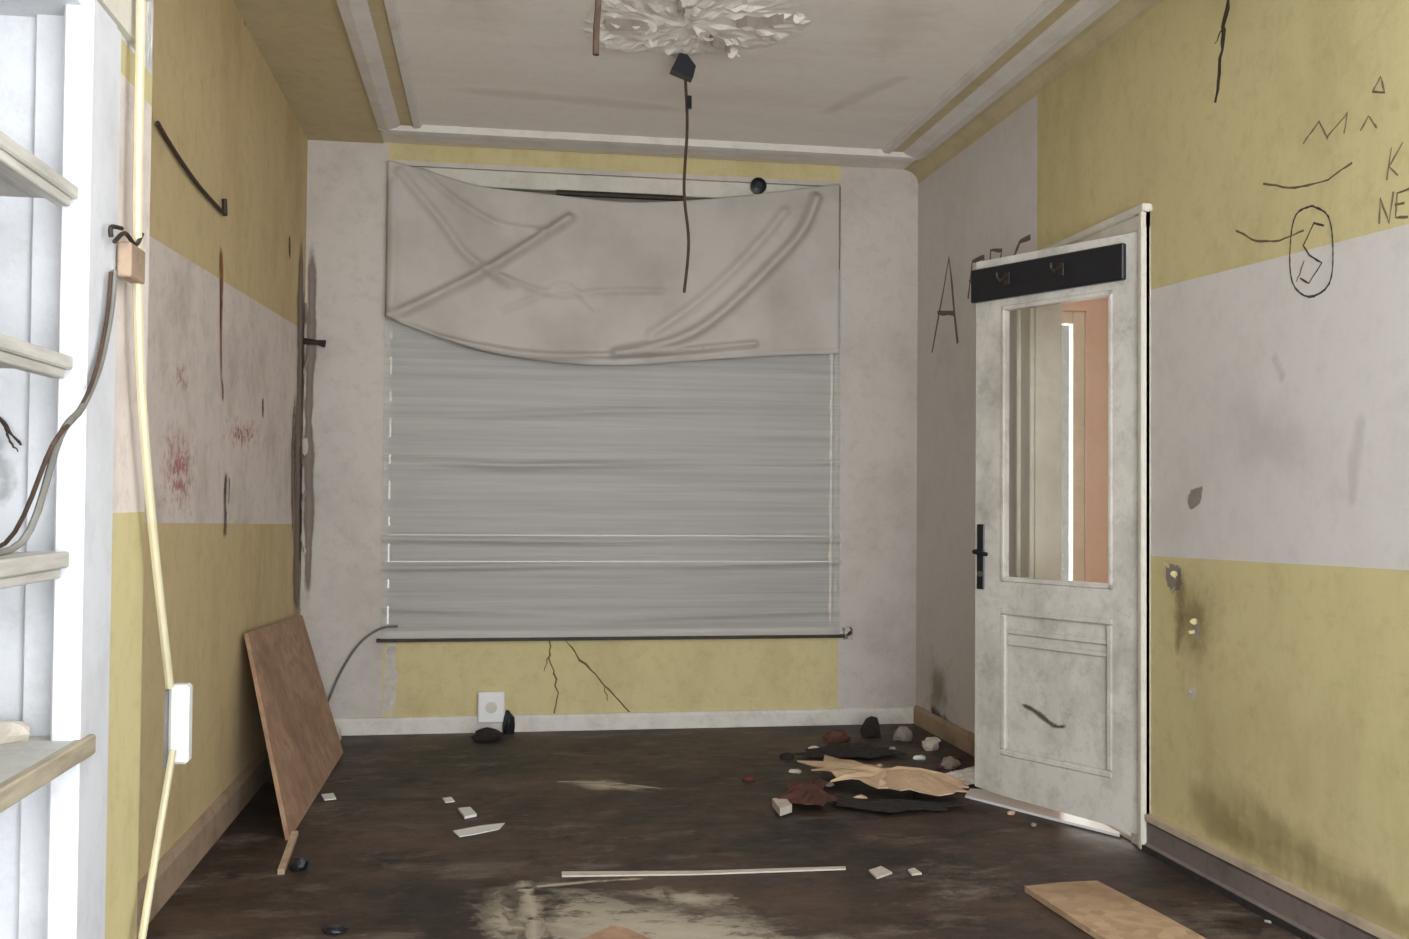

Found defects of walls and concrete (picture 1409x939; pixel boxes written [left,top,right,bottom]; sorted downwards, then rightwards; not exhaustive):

flaking render [581,0,815,58]
crack [1214,0,1230,103]
crack [544,641,630,714]